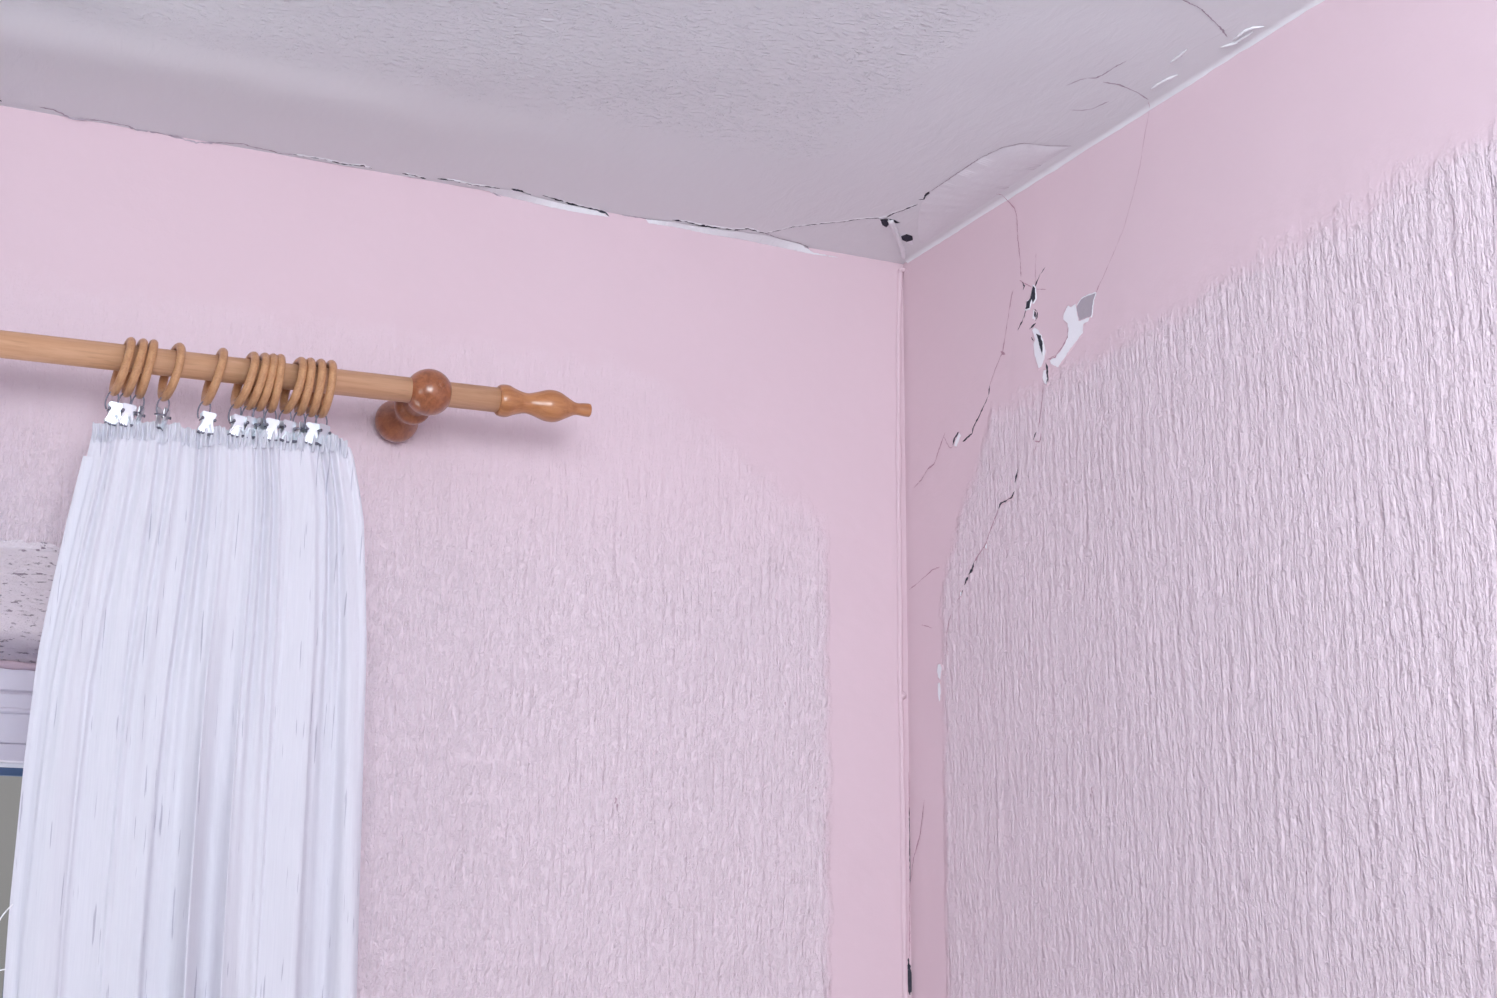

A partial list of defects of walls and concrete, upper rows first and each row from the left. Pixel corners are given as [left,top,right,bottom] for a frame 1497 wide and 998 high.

crack [1183,0,1227,36]
crack [0,100,1050,257]
crack [1068,61,1150,281]
crack [916,194,1021,485]
flaking render [1018,263,1100,387]
crack [909,390,1043,702]
crack [907,773,924,995]